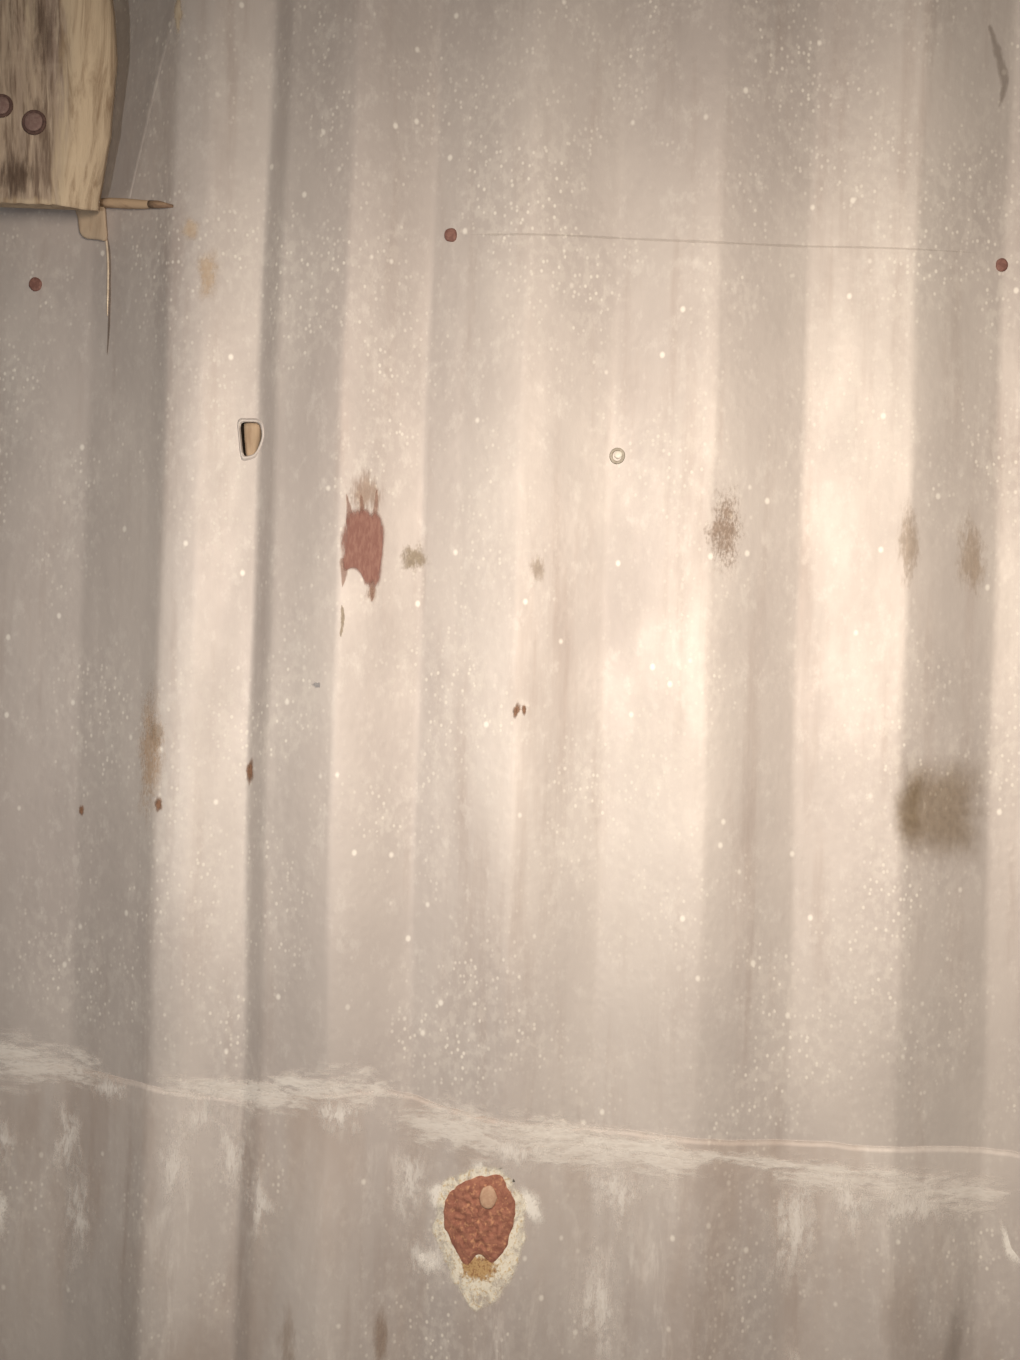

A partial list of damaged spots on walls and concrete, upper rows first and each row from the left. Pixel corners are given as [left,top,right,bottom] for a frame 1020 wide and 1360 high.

rust [342,510,383,585]
damp [0,1036,125,1099]
rust [414,1162,542,1311]
rust [1002,1228,1020,1263]